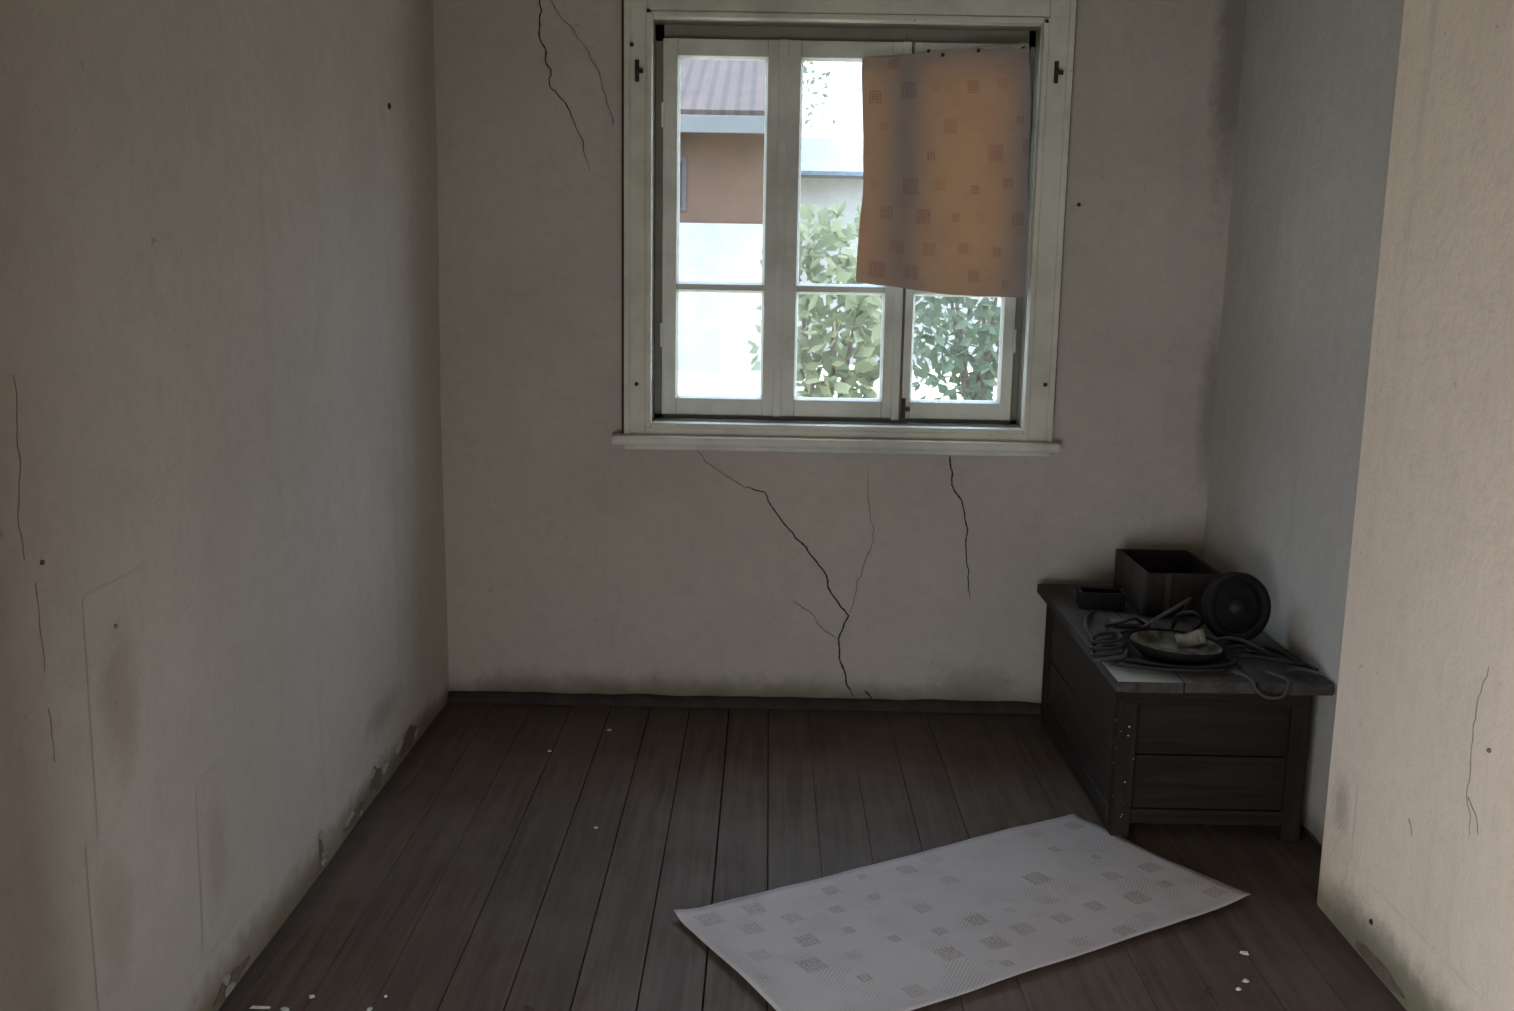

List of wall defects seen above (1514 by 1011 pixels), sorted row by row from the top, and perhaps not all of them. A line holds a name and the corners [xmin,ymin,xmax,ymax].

crack [538,0,614,165]
crack [13,375,55,762]
crack [697,451,874,699]
crack [949,457,970,595]
crack [1466,666,1489,835]